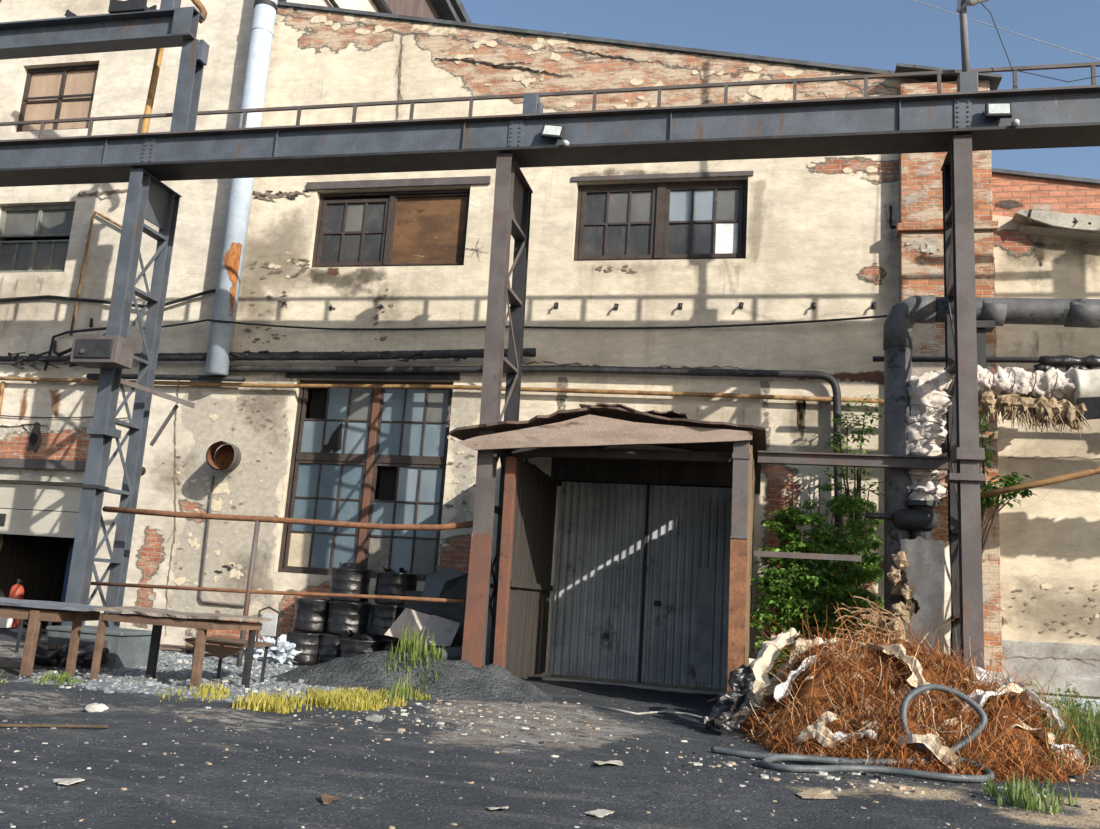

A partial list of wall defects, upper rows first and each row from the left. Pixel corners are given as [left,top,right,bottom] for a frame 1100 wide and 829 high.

crack [395,35,403,120]
flaking render [275,6,933,112]
corrosion [224,243,242,317]
peeling [240,291,287,347]
leakage [312,269,394,341]
flaking render [856,262,886,286]
flaking render [0,419,92,461]
peeling [761,380,771,449]
peeling [134,372,343,647]
flaking render [761,464,804,594]
flaking render [761,606,782,640]
flaking render [853,560,884,635]